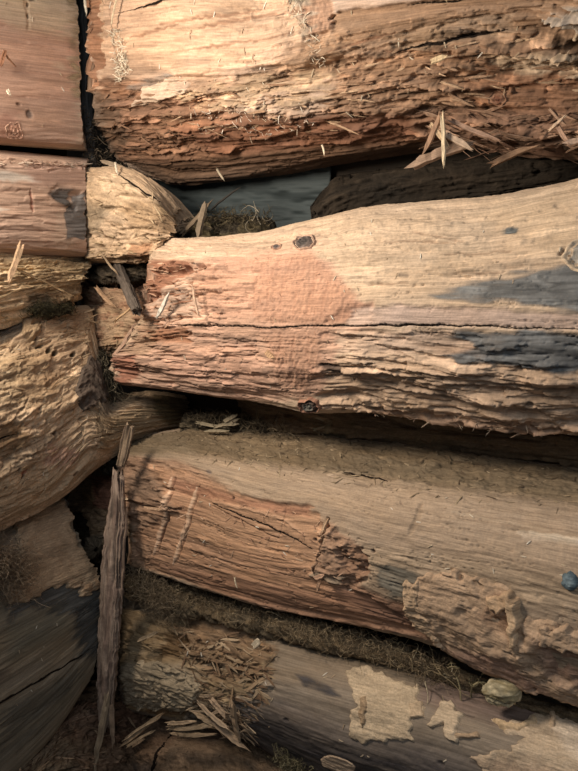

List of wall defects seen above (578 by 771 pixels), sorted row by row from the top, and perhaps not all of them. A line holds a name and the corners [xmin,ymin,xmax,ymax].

crack [118,0,163,13]
damp [49,189,87,239]
damp [434,265,578,312]
crack [145,323,578,338]
damp [446,330,578,373]
damp [0,423,29,447]
crack [213,503,312,549]
peeling [486,589,524,649]
peeling [538,623,578,654]
crack [0,649,90,704]
peeling [346,665,481,744]
peeling [470,711,578,771]